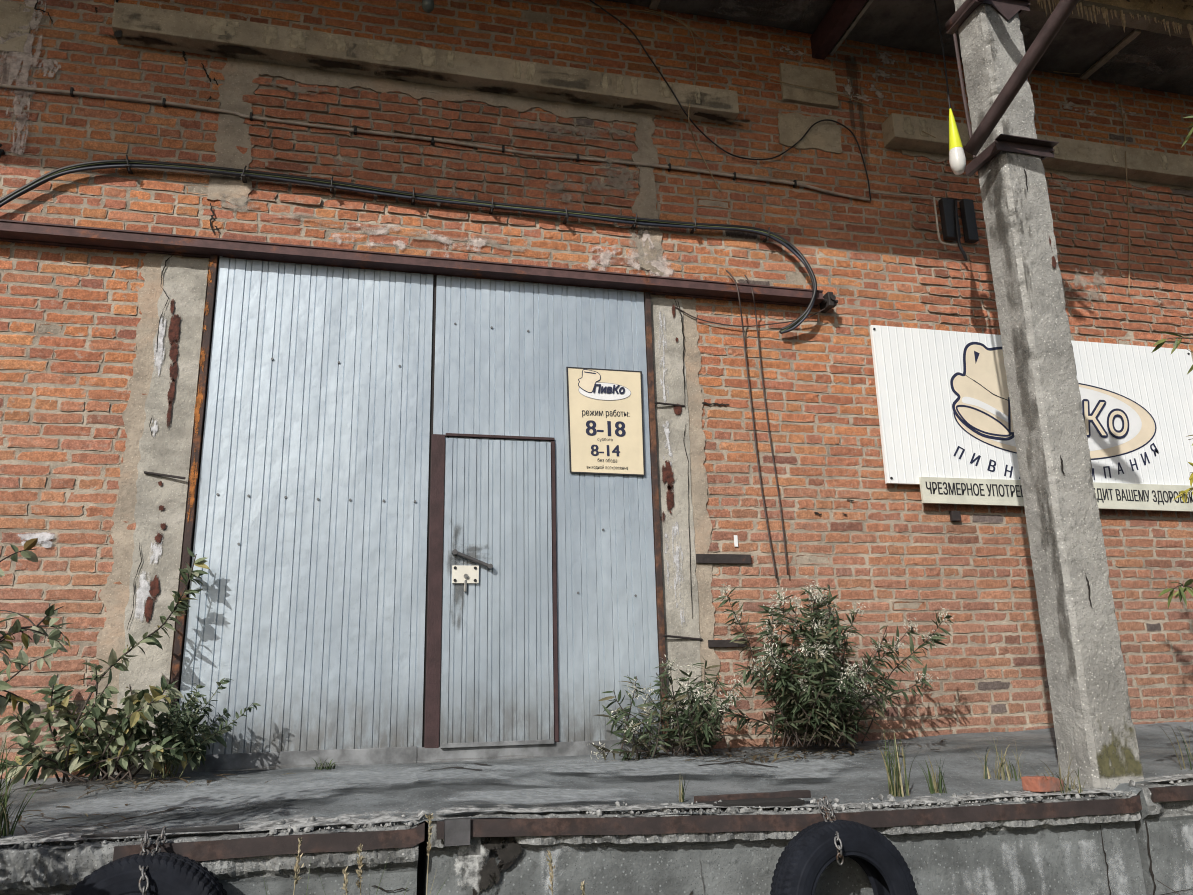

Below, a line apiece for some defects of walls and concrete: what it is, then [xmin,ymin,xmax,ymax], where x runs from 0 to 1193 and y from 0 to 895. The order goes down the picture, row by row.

crack [156,254,174,352]
spalling [151,299,181,437]
corrosion [194,388,203,433]
corrosion [187,451,198,522]
crack [127,543,142,629]
peeling [135,505,166,622]
spalling [1141,774,1193,782]
spalling [0,788,1123,845]
spalling [455,836,522,893]